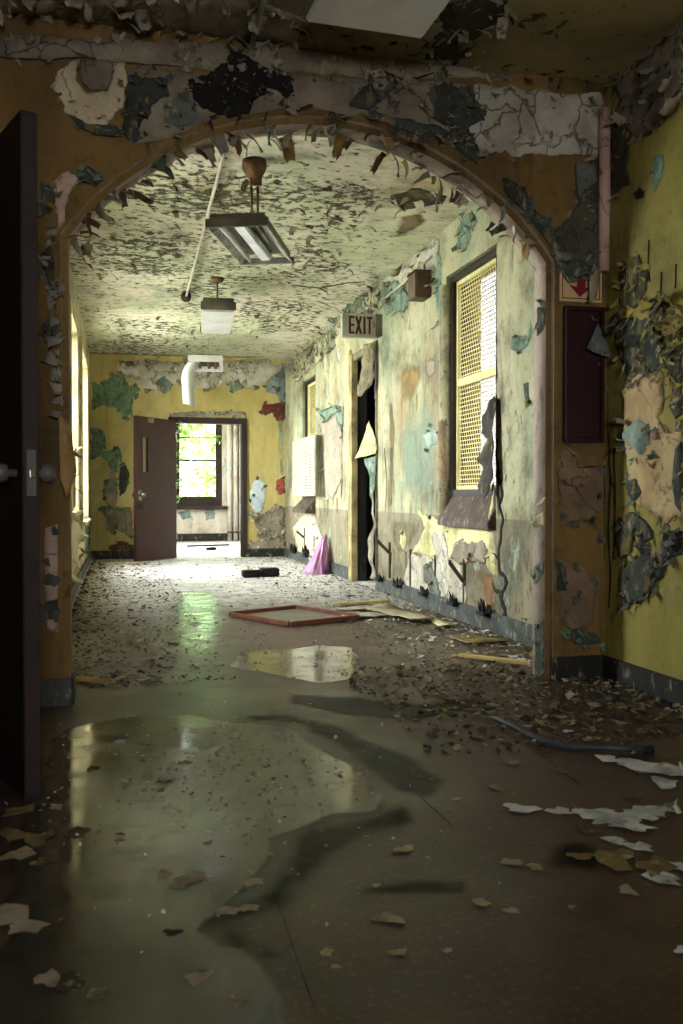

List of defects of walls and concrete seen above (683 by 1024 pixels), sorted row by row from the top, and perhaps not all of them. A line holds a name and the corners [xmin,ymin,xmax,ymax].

spalling [0,0,683,653]